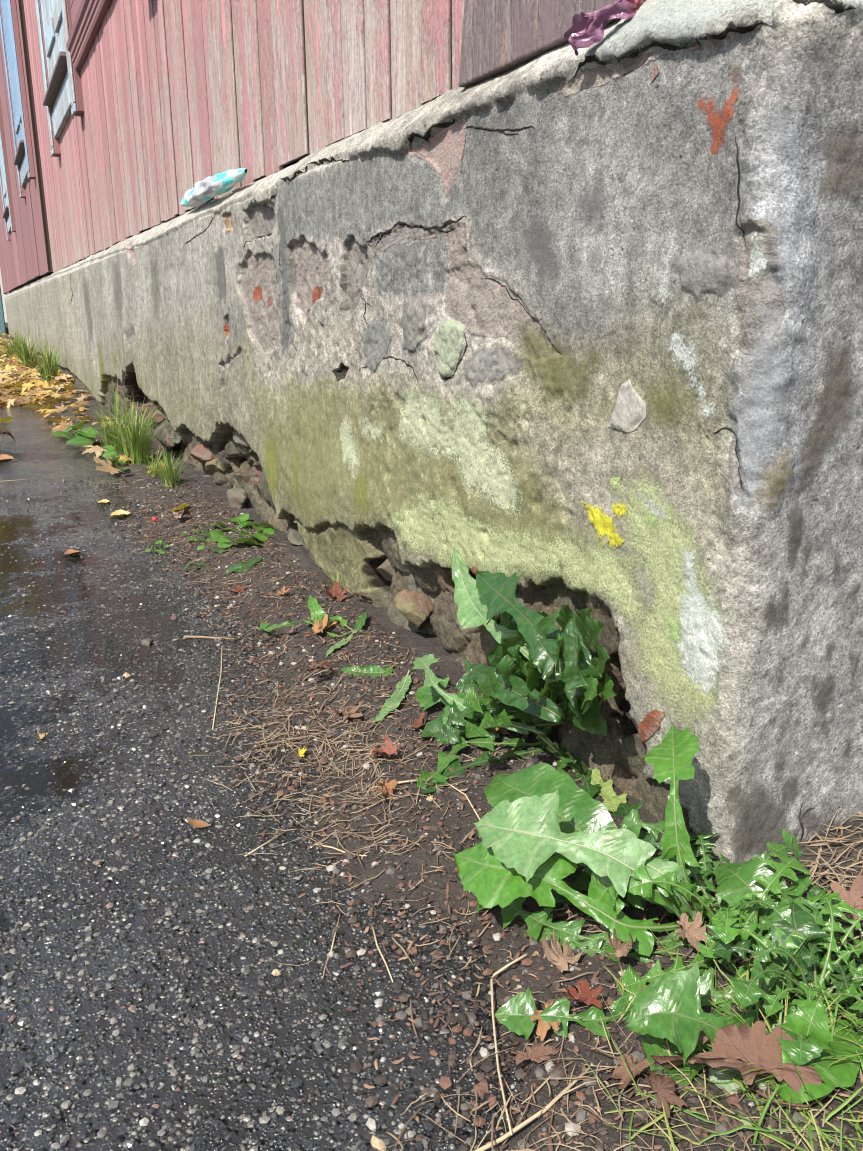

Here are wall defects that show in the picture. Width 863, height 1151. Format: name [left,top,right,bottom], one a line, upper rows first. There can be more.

crack [793,0,857,14]
crack [571,20,773,80]
crack [408,119,534,151]
crack [735,136,747,249]
crack [365,216,464,247]
spalling [217,349,243,389]
spalling [332,363,349,381]
damp [665,332,716,422]
crack [715,427,744,491]
damp [673,547,724,693]